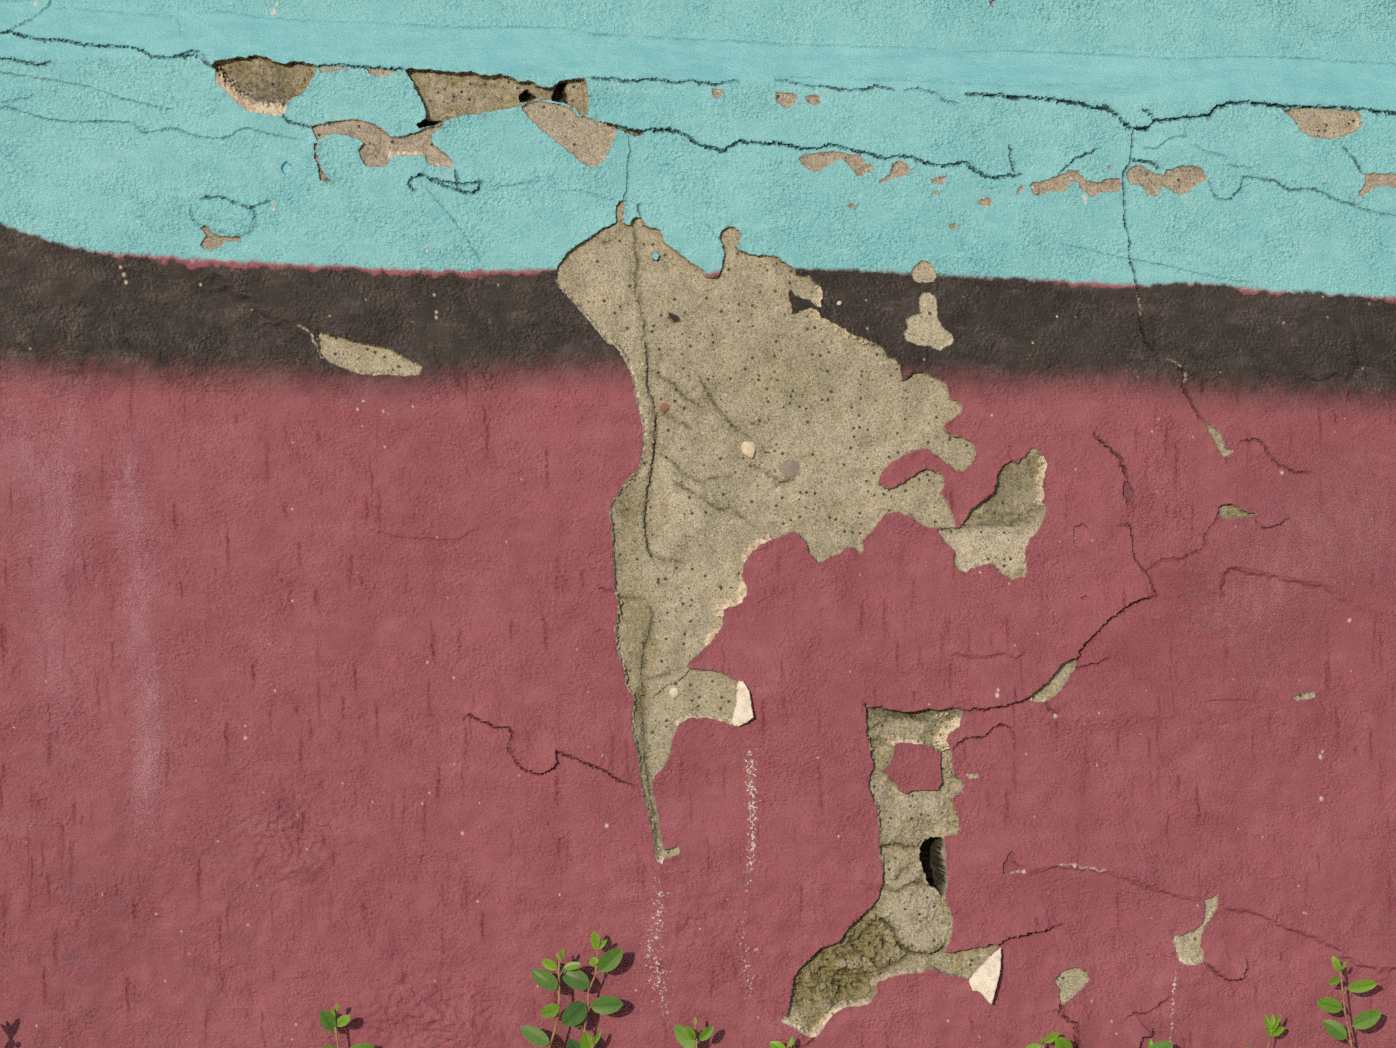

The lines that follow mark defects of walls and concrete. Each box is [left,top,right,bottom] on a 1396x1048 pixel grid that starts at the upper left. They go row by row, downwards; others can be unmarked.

spalling [213,54,348,116]
spalling [311,68,616,168]
crack [0,0,1396,424]
peeling [1016,165,1208,196]
spalling [315,331,422,376]
spalling [554,201,1047,864]
crack [1073,510,1396,670]
crack [463,713,637,787]
crack [950,692,1057,753]
spalling [782,703,1002,1037]
crack [988,923,1064,947]
crack [1020,864,1396,973]